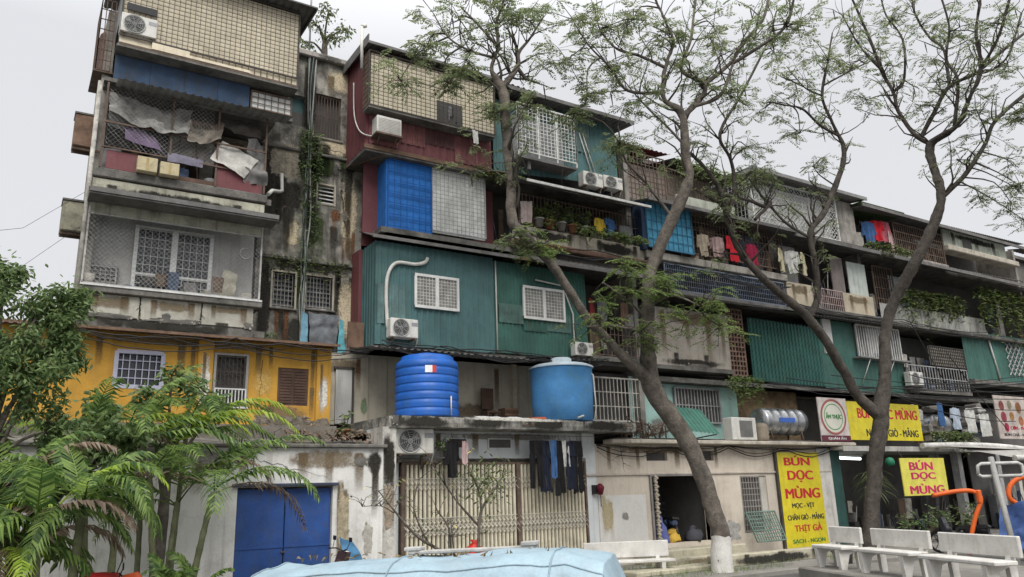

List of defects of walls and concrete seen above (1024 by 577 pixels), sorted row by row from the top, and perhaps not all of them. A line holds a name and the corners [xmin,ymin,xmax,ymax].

water stain [265,67,352,251]
water stain [291,438,395,501]